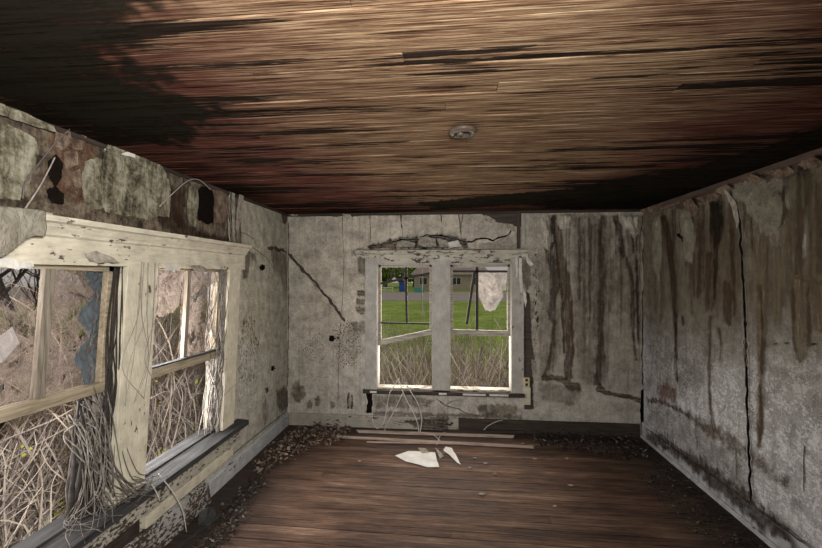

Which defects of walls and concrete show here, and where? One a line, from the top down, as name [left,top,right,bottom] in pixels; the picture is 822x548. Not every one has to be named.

spalling [54,131,87,194]
spalling [213,189,235,242]
crack [231,216,346,457]
damp [417,123,822,472]
crack [645,189,812,548]